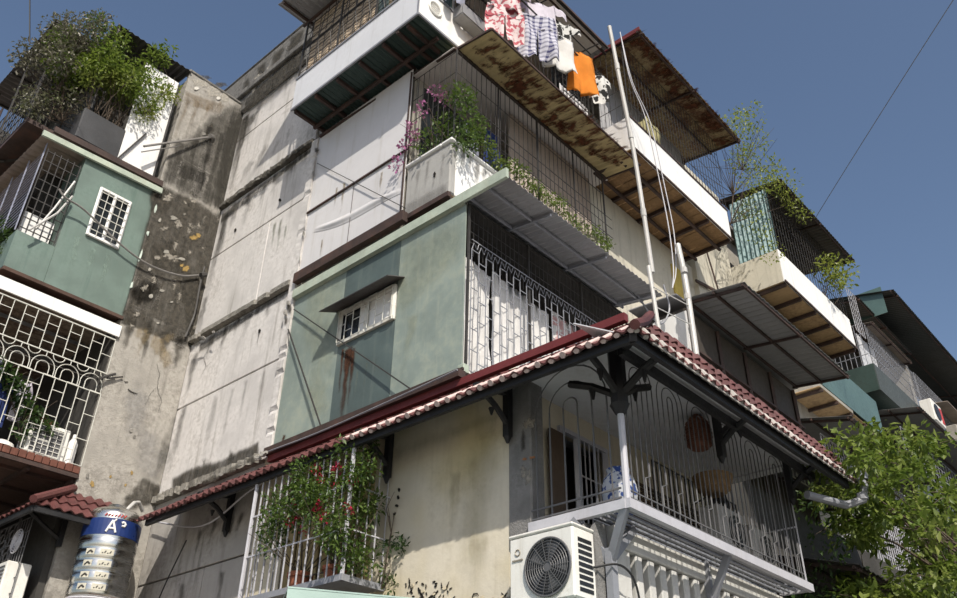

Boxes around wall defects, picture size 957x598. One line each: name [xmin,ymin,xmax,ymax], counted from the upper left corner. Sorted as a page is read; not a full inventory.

rust [475,39,646,166]
rust [629,31,734,146]
damp [121,31,310,359]
rust [340,348,355,408]